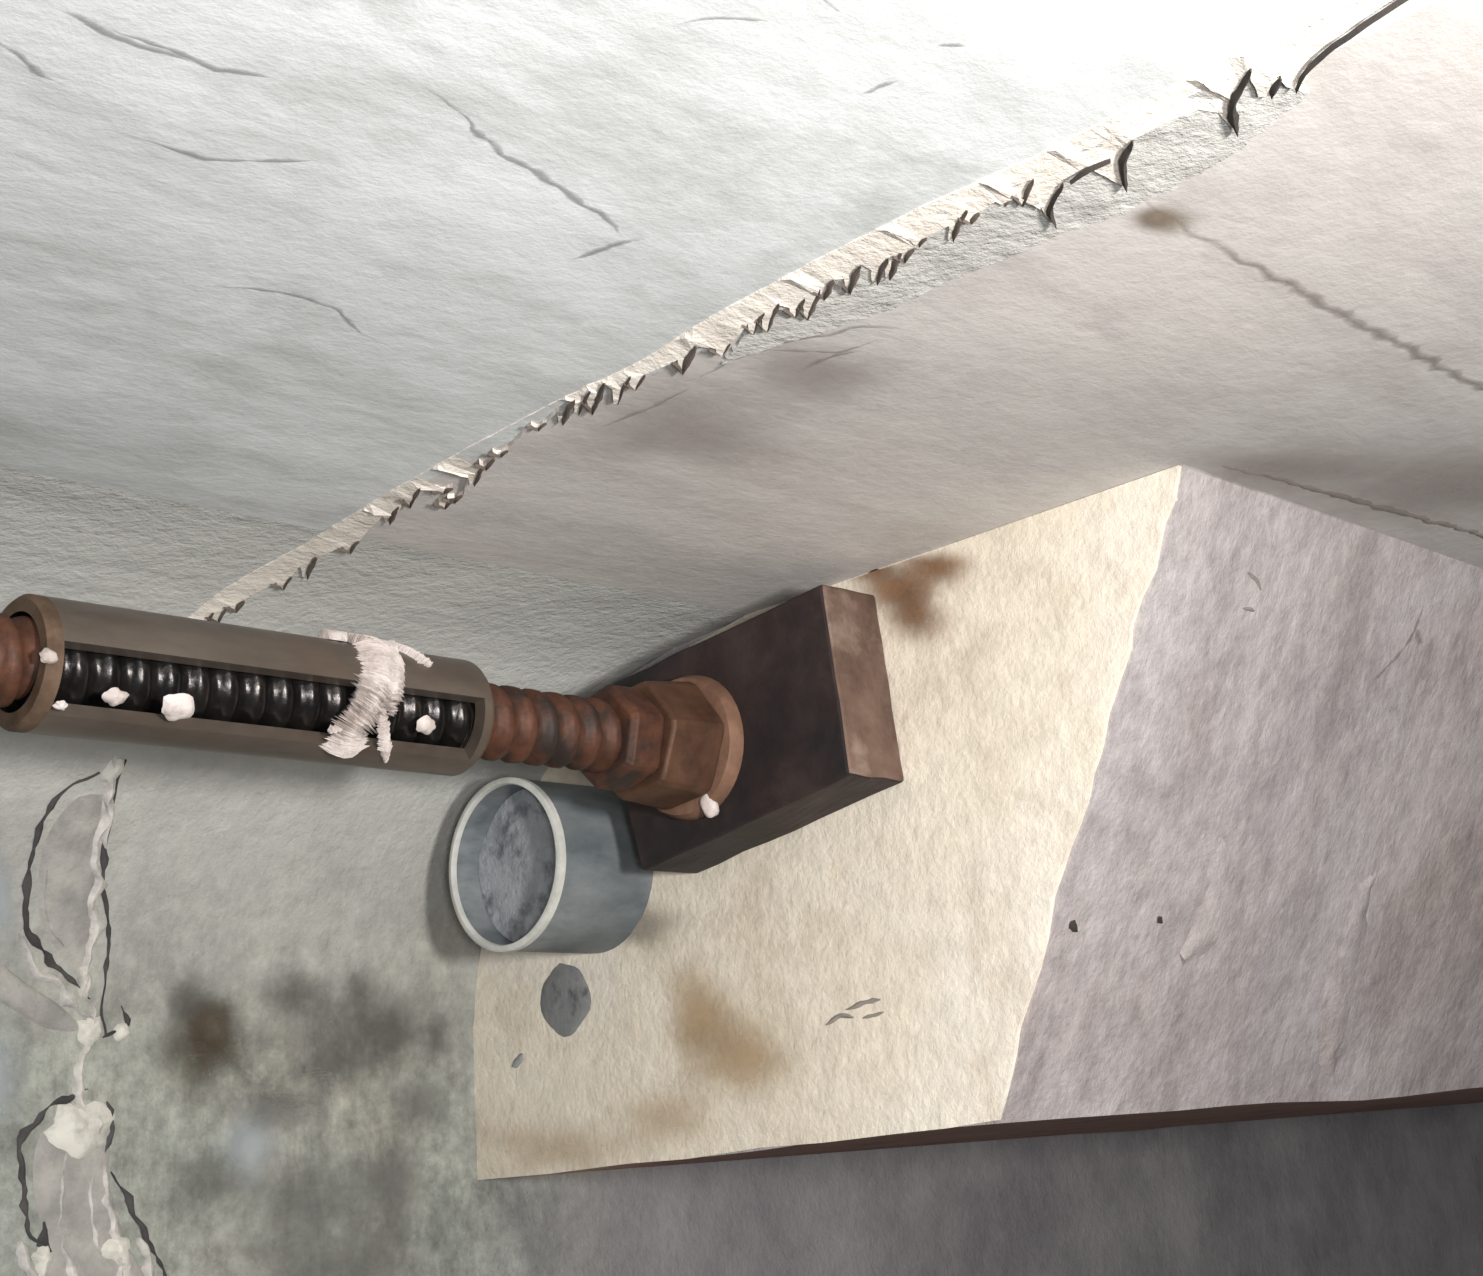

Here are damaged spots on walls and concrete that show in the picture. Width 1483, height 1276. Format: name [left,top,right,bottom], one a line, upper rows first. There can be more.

crack [188,0,1408,623]
crack [1223,465,1483,539]
rust [865,558,958,629]
crack [0,756,167,1276]
leakage [174,998,232,1075]